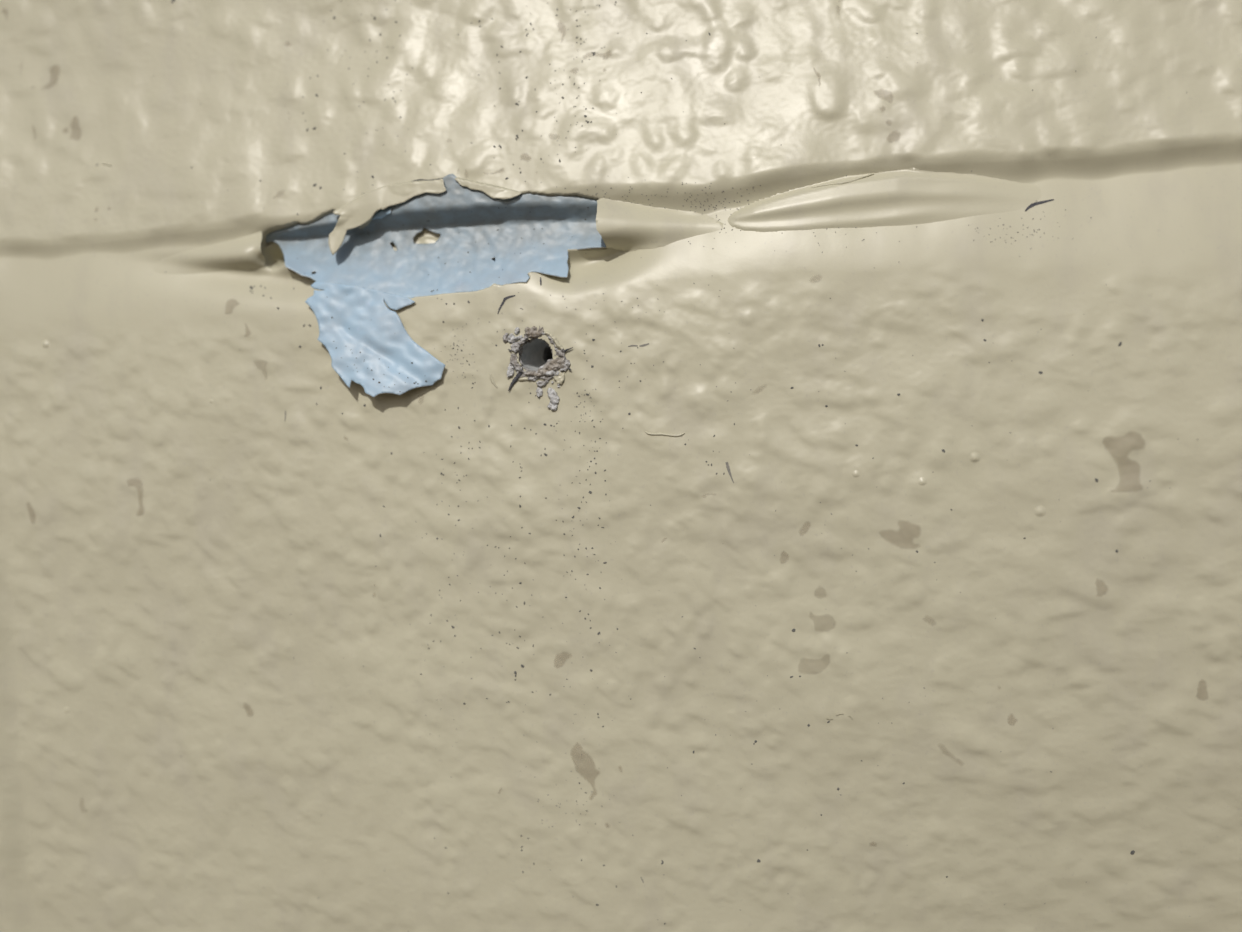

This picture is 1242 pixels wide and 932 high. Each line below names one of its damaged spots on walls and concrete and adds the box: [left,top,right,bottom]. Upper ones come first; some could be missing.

peeling [266,174,607,397]
spalling [507,327,566,411]